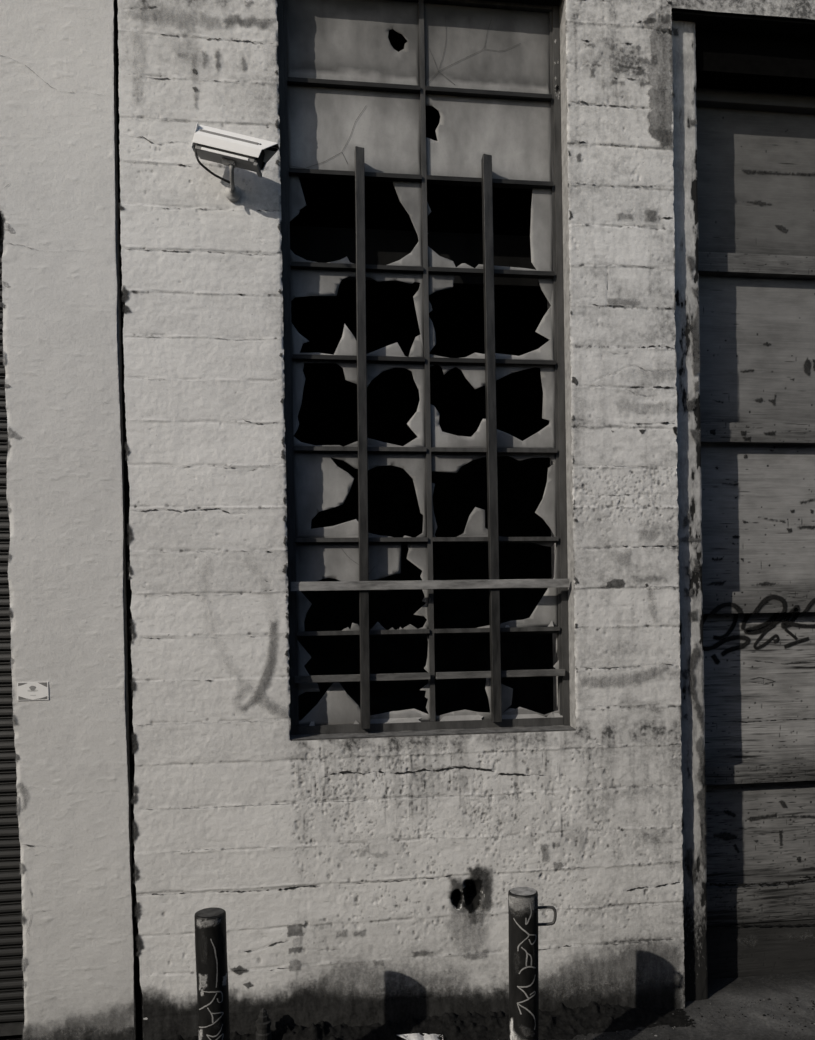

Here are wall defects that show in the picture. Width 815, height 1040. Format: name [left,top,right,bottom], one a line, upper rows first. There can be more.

leakage [153,12,269,28]
peeling [685,256,700,411]
crack [221,766,550,807]
peeling [681,644,739,884]
spalling [451,879,482,913]
leakage [287,923,307,971]
leakage [22,992,198,1040]
leakage [229,962,509,1035]
leakage [539,943,684,1012]